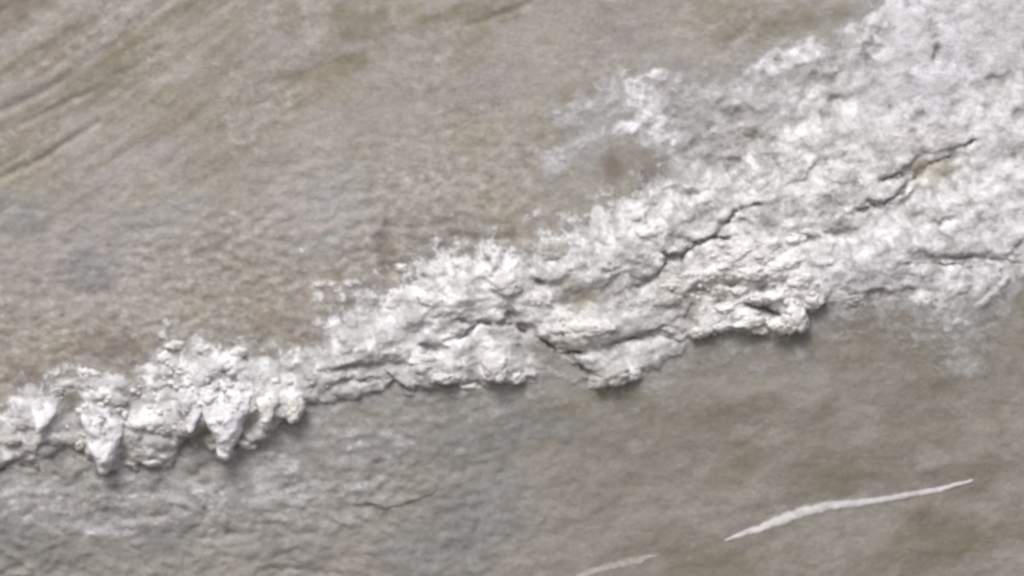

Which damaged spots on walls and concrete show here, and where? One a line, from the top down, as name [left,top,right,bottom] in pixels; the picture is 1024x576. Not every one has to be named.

crack [852,141,974,215]
damp [946,340,983,378]
damp [261,414,436,469]
damp [433,405,574,461]
damp [0,479,49,511]
damp [118,471,135,484]
damp [157,464,281,511]
damp [245,459,300,495]
damp [51,505,136,536]
damp [381,465,523,576]